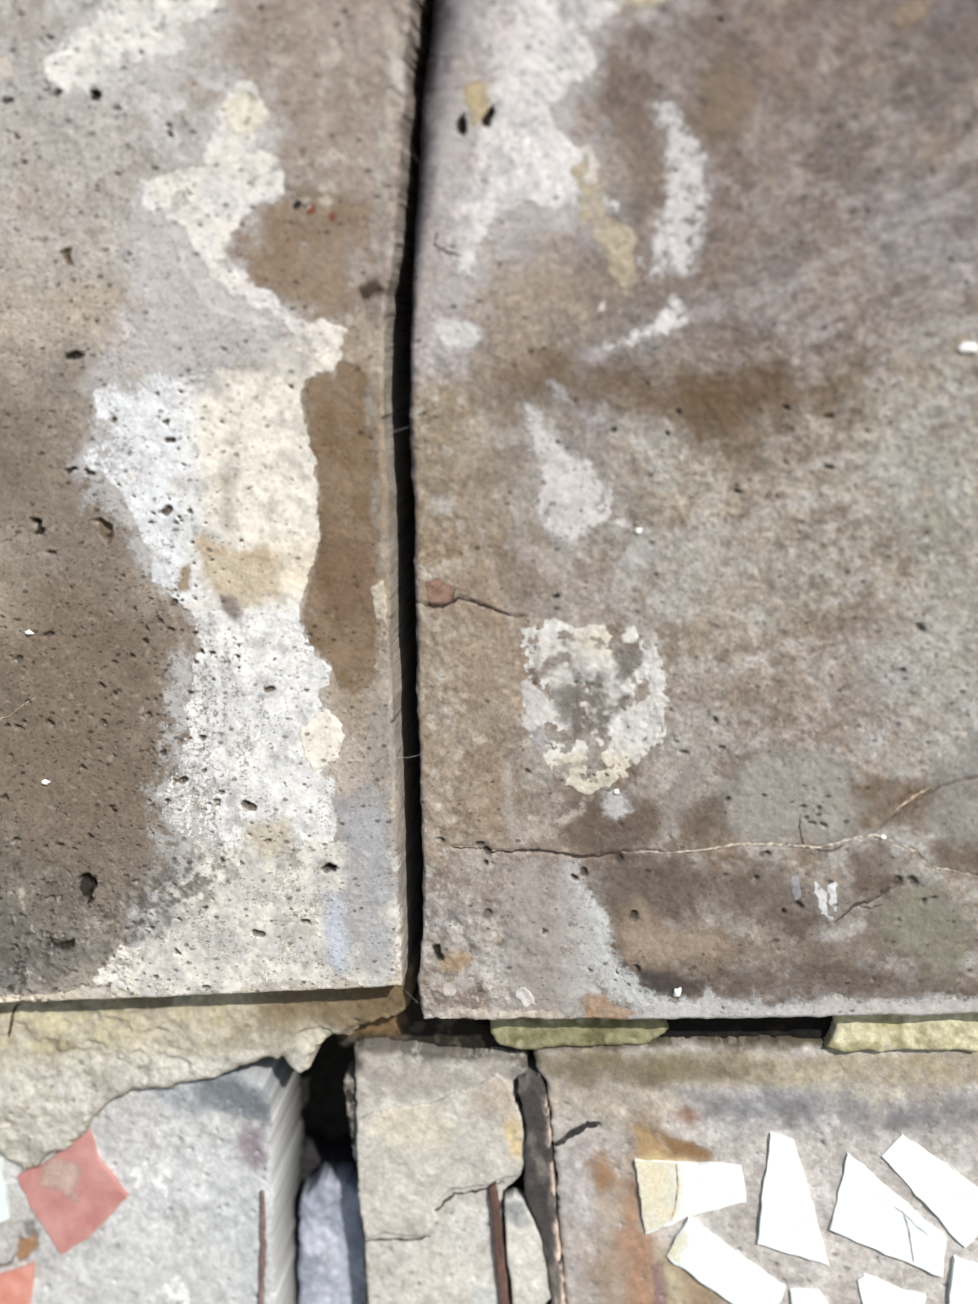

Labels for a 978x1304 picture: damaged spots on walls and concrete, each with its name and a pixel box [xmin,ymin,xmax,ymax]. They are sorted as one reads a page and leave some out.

water stain [237,147,382,326]
crack [433,231,462,256]
water stain [444,0,713,302]
water stain [577,295,730,362]
water stain [197,538,278,619]
water stain [304,361,379,693]
crack [415,589,523,617]
water stain [461,404,630,632]
water stain [93,792,404,998]
crack [452,775,978,922]
crack [365,1181,502,1242]
rust [625,1128,708,1304]